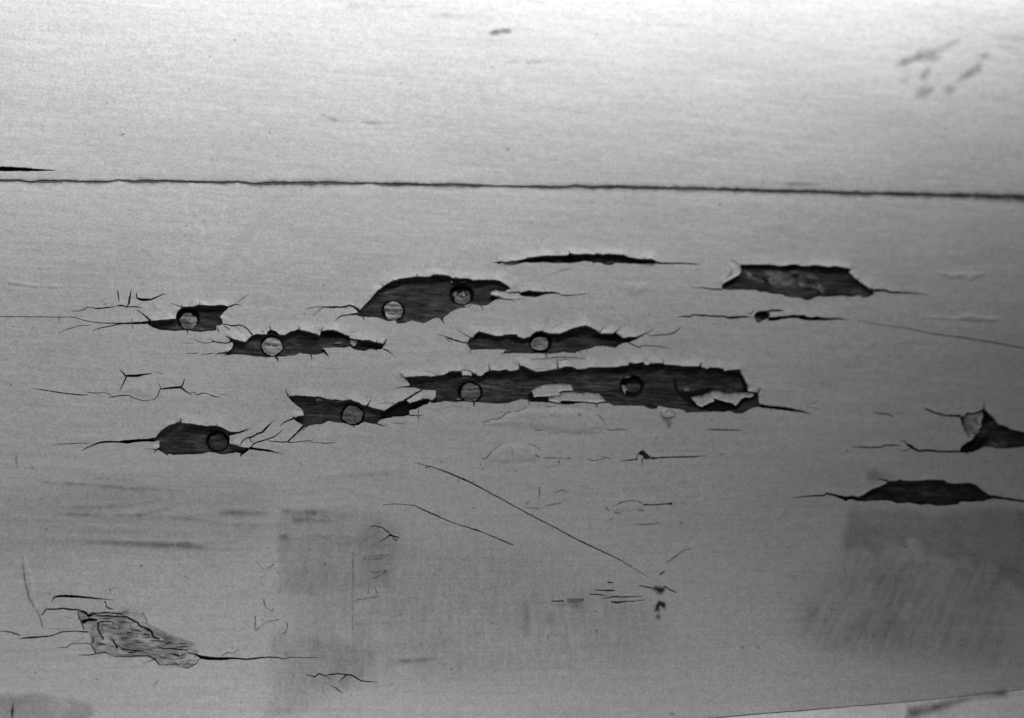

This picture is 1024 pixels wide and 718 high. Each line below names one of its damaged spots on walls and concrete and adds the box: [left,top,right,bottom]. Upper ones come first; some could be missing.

peeling [517,250,699,277]
peeling [693,260,926,300]
crack [678,309,1024,349]
crack [37,370,229,401]
peeling [59,275,818,456]
peeling [858,406,1024,453]
peeling [620,449,701,464]
peeling [795,479,1024,506]
crack [370,504,513,545]
crack [418,463,692,604]
crack [3,588,373,696]